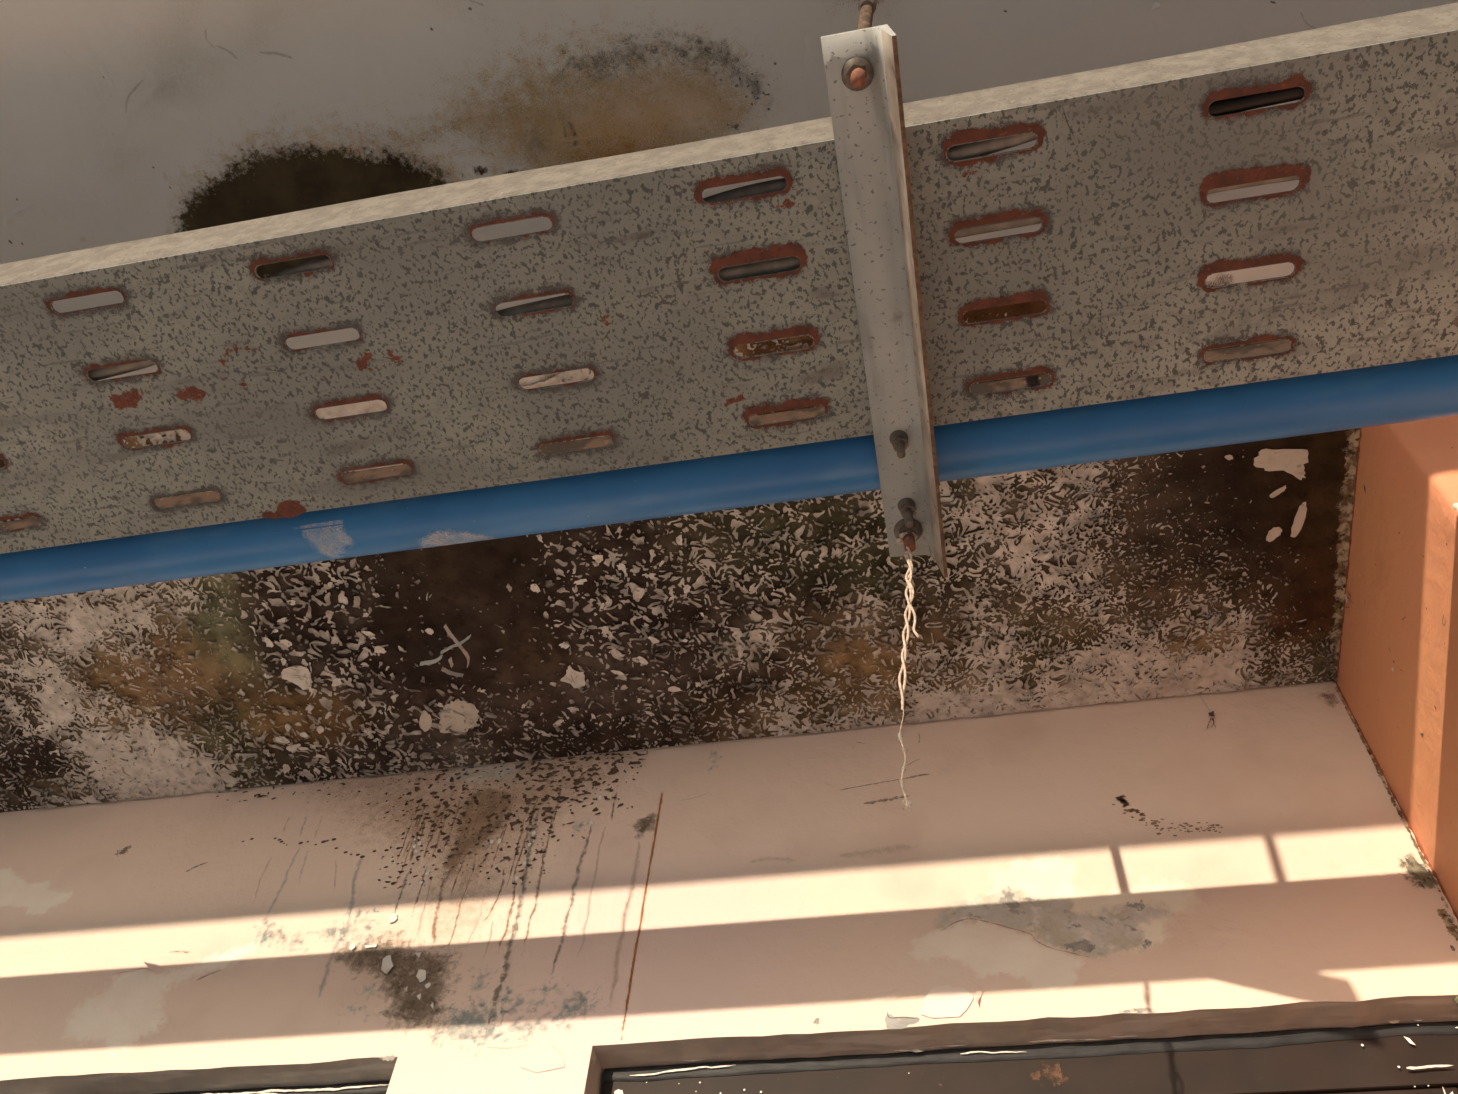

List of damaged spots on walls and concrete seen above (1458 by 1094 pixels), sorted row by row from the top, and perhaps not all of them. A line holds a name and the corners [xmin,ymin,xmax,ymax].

leakage [162,5,787,235]
leakage [256,255,326,278]
leakage [316,400,387,419]
leakage [520,368,594,389]
leakage [735,335,814,357]
leakage [963,300,1046,323]
leakage [0,429,1351,1064]
peeling [0,862,108,932]
corrosion [620,793,663,1040]
peeling [883,848,1204,1030]
peeling [15,940,264,1075]